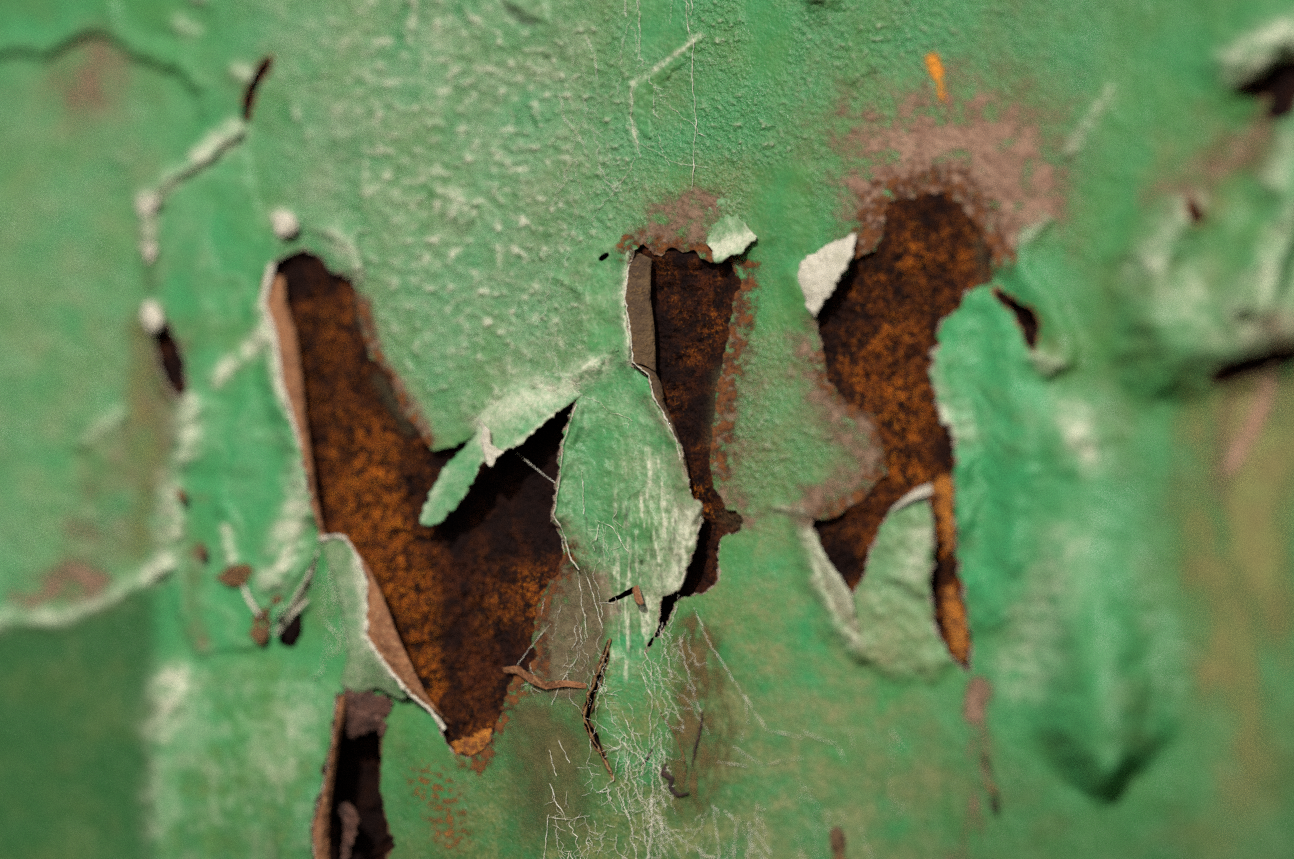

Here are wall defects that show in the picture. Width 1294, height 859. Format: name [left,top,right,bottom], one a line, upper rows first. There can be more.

crack [240,54,275,123]
corrosion [634,189,720,256]
corrosion [832,55,1068,256]
peeling [0,35,760,859]
corrosion [355,290,433,444]
corrosion [712,279,755,528]
corrosion [791,317,884,525]
peeling [798,162,1049,677]